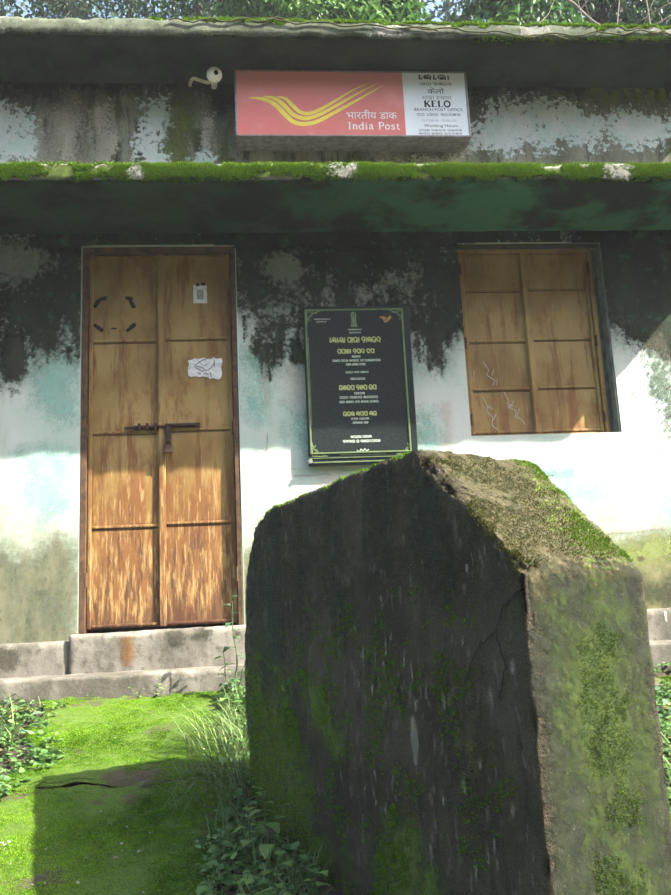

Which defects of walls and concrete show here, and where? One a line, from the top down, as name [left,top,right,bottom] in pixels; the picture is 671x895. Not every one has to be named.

damp [135,120,145,162]
damp [192,129,203,153]
damp [0,230,671,392]
damp [0,534,78,669]
damp [284,463,455,618]
crack [463,589,525,700]
damp [621,533,671,622]